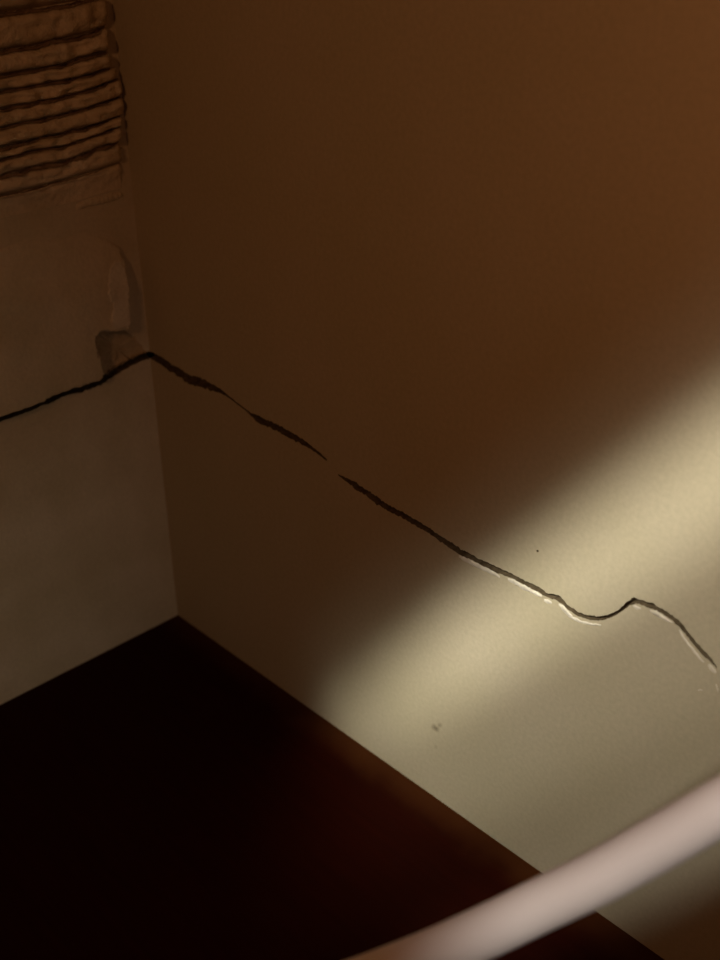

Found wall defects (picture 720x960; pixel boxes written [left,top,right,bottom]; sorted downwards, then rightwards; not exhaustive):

crack [0,351,717,673]